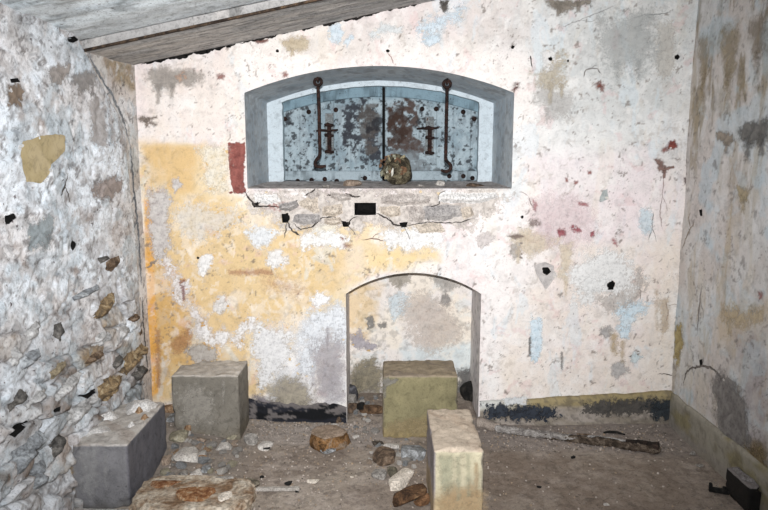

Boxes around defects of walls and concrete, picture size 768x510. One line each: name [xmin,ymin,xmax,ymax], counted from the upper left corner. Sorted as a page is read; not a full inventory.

crack [245,189,470,241]
spalling [145,142,509,390]
spalling [534,262,557,289]
crack [659,362,720,383]
spalling [9,419,29,439]